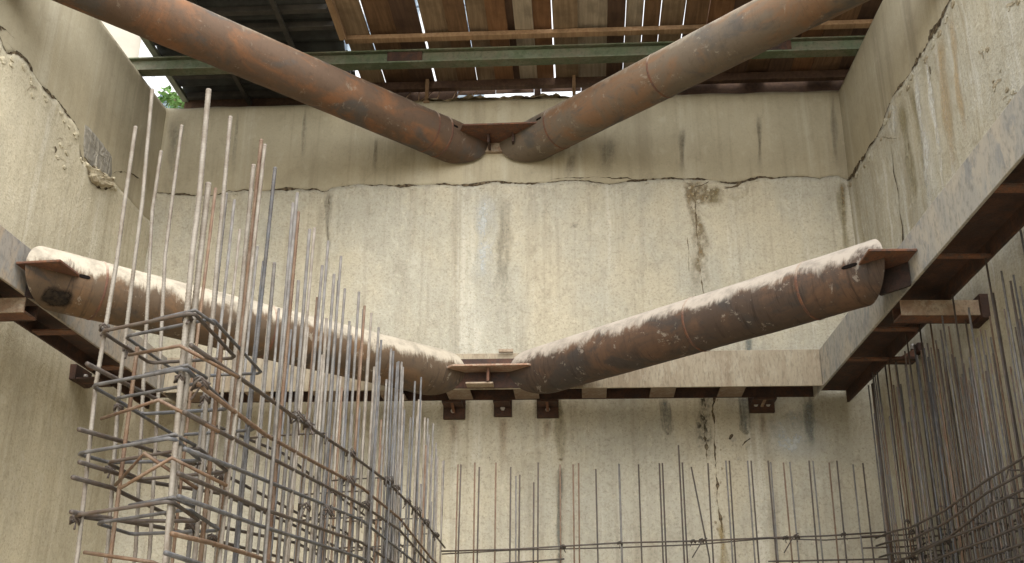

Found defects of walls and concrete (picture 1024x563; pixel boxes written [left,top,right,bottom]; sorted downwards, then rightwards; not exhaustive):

spalling [83,125,117,191]
crack [847,0,955,242]
crack [158,176,823,293]
damp [698,398,709,458]
crack [708,398,750,536]